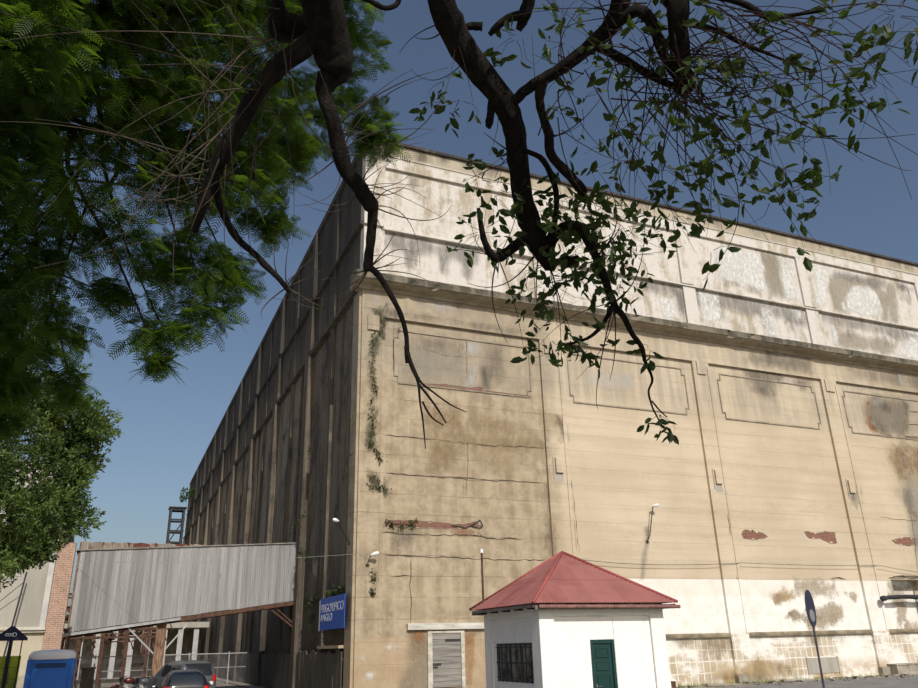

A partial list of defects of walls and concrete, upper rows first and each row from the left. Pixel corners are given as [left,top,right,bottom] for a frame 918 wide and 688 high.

leakage [390,235,477,276]
leakage [696,290,803,324]
spalling [385,519,482,530]
spalling [741,529,768,540]
spalling [804,531,837,544]
spalling [891,537,918,546]